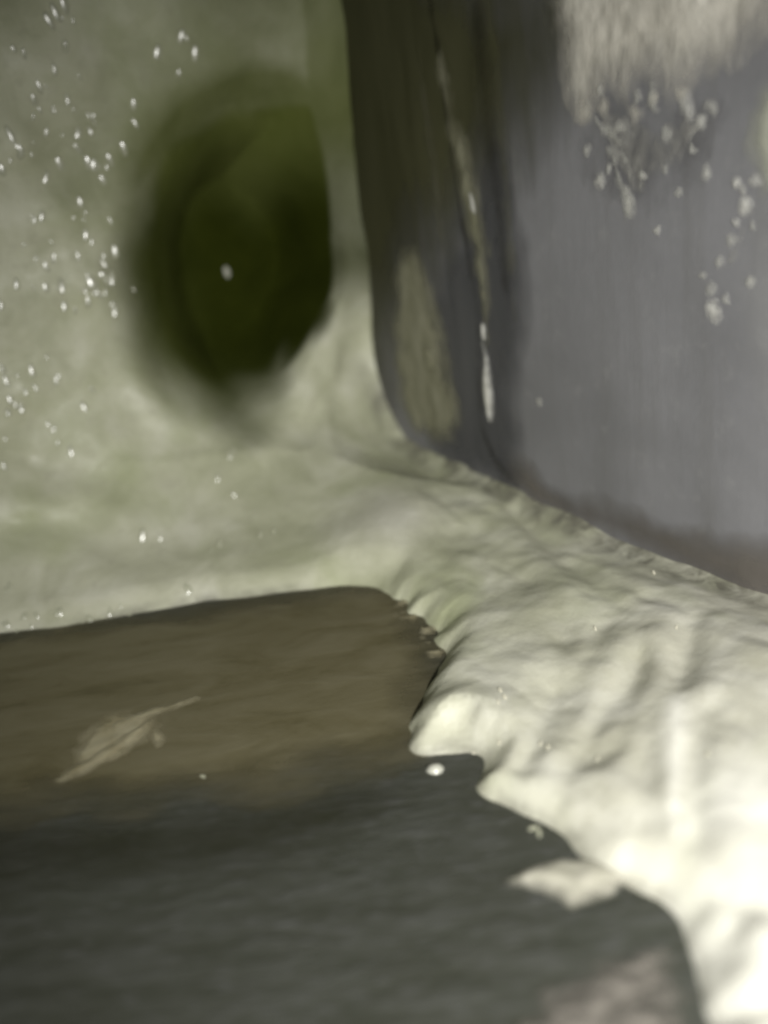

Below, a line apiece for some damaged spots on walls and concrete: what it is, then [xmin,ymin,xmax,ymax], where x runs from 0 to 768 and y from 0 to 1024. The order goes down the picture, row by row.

damp [0,0,768,633]
damp [0,464,768,1024]